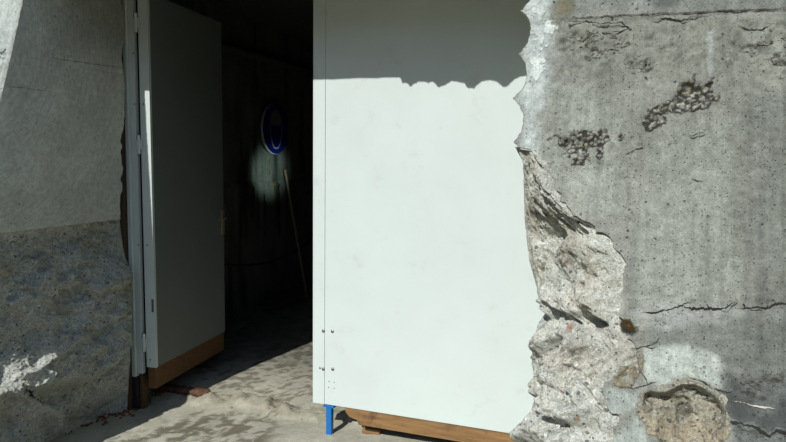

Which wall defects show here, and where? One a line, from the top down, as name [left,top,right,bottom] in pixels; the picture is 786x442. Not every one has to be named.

crack [553,8,786,35]
spalling [509,147,644,442]
crack [642,299,786,313]
spalling [0,219,133,442]
corrosion [619,319,638,332]
crack [687,374,732,393]
spalling [636,378,731,442]
crack [724,416,786,437]